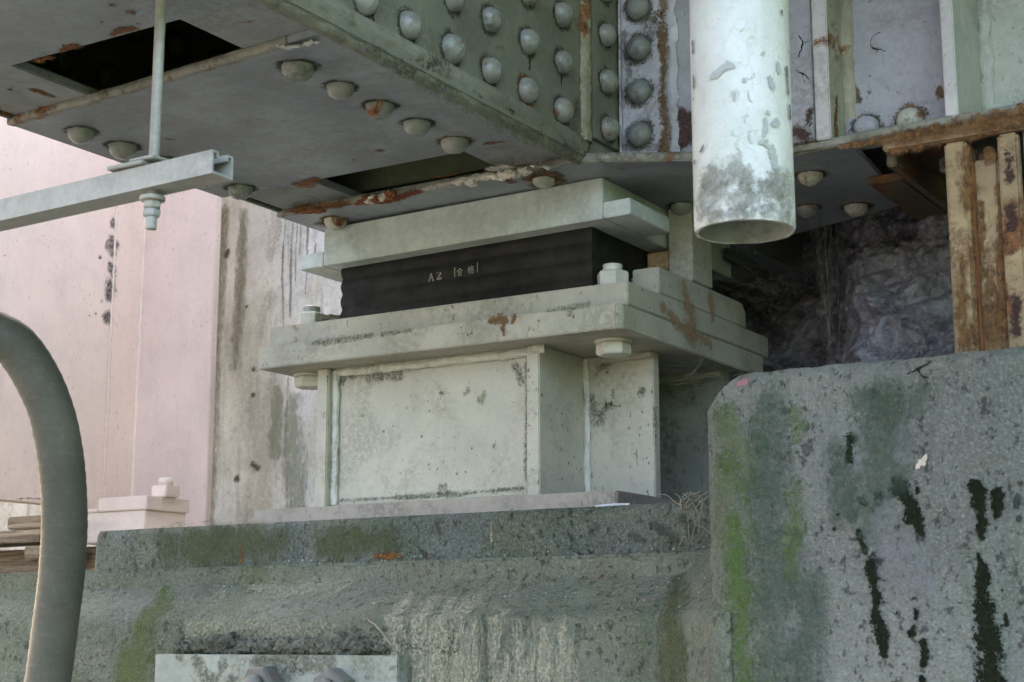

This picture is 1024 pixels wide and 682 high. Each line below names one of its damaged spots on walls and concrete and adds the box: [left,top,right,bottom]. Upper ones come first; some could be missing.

rust [652,0,692,152]
peeling [710,60,746,101]
peeling [759,61,791,175]
rust [792,108,814,143]
rust [285,174,454,227]
rust [833,96,1024,352]
damp [214,209,246,432]
rust [488,313,516,336]
damp [268,386,307,508]
damp [827,382,926,660]
damp [907,596,930,682]
damp [967,479,1023,682]